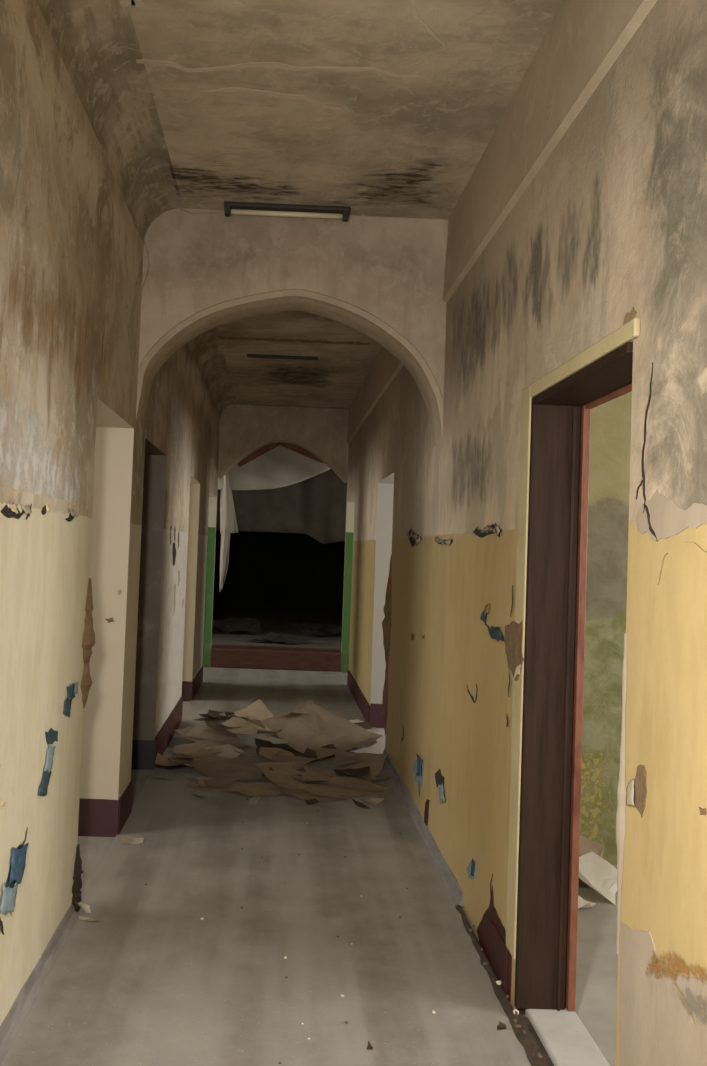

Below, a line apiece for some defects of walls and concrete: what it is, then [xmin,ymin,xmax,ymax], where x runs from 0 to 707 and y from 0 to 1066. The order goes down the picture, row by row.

leakage [170,167,295,200]
leakage [358,164,441,203]
leakage [9,278,105,413]
leakage [454,234,597,381]
peeling [0,502,50,520]
efflorescence [0,402,80,501]
crack [636,362,668,585]
spalling [63,578,114,718]
peeling [38,728,58,797]
peeling [0,827,29,935]
peeling [477,874,512,1001]
peeling [616,633,707,1066]